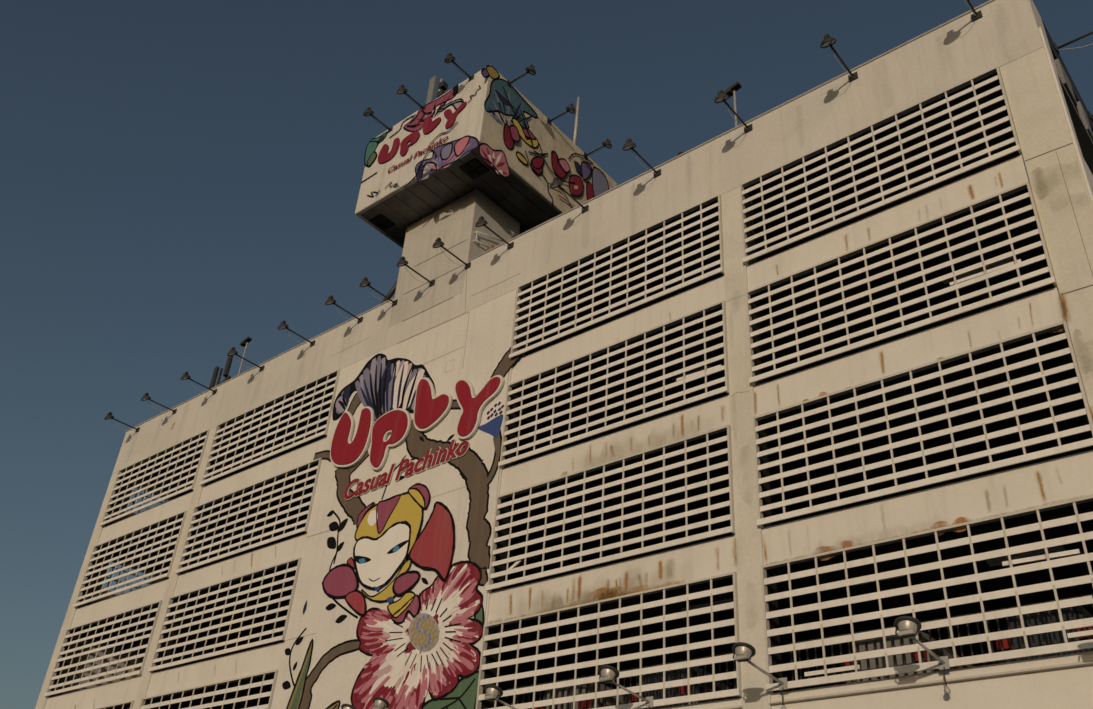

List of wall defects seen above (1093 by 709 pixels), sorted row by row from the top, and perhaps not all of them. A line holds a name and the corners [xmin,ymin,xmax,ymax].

corrosion [915,517,969,535]
corrosion [567,562,679,606]